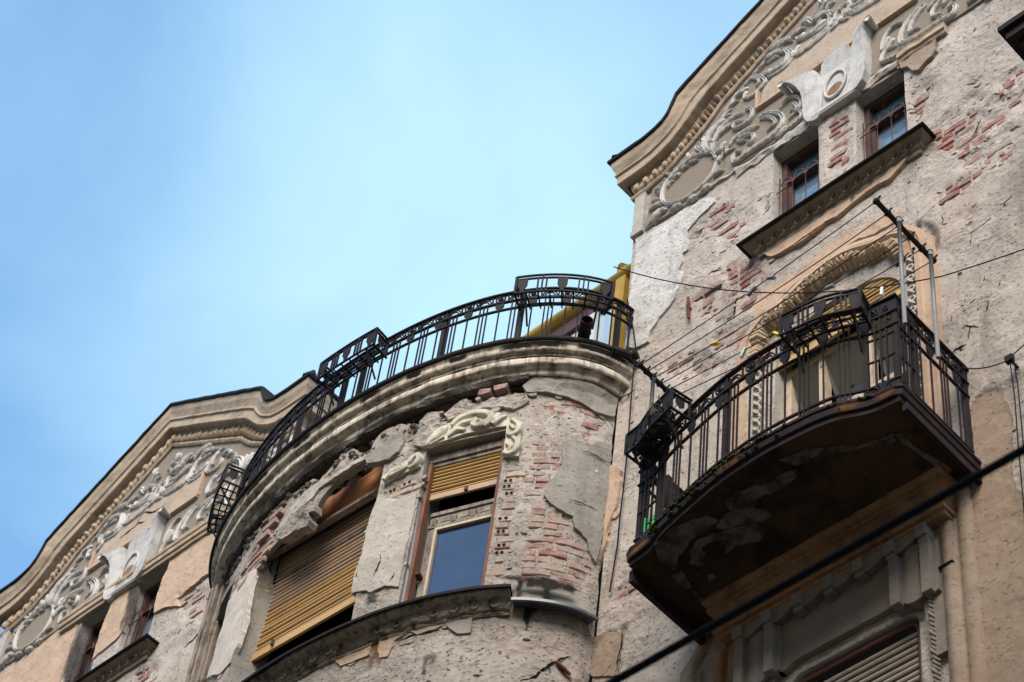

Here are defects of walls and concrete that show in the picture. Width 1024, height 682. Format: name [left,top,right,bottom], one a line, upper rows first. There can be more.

flaking render [824,112,876,175]
flaking render [925,54,1024,224]
flaking render [657,155,920,379]
spalling [221,373,623,600]